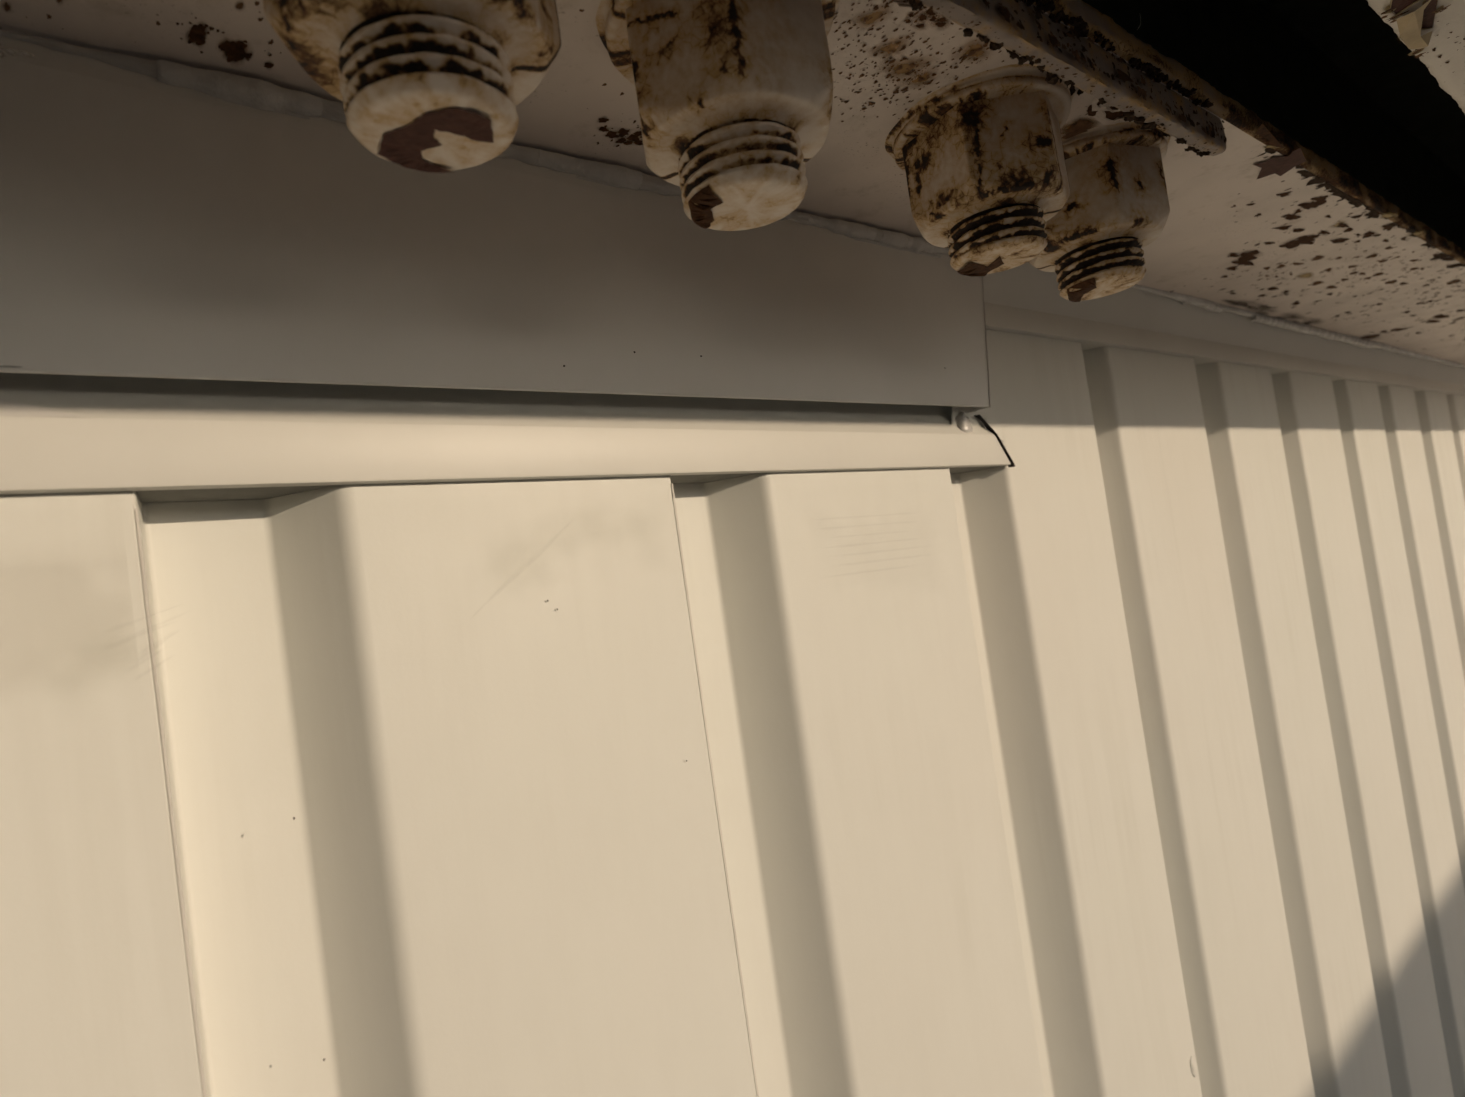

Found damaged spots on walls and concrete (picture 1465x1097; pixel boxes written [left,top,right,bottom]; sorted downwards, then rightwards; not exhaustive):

peeling [1381,0,1451,59]
corrosion [831,0,1227,157]
corrosion [587,108,643,147]